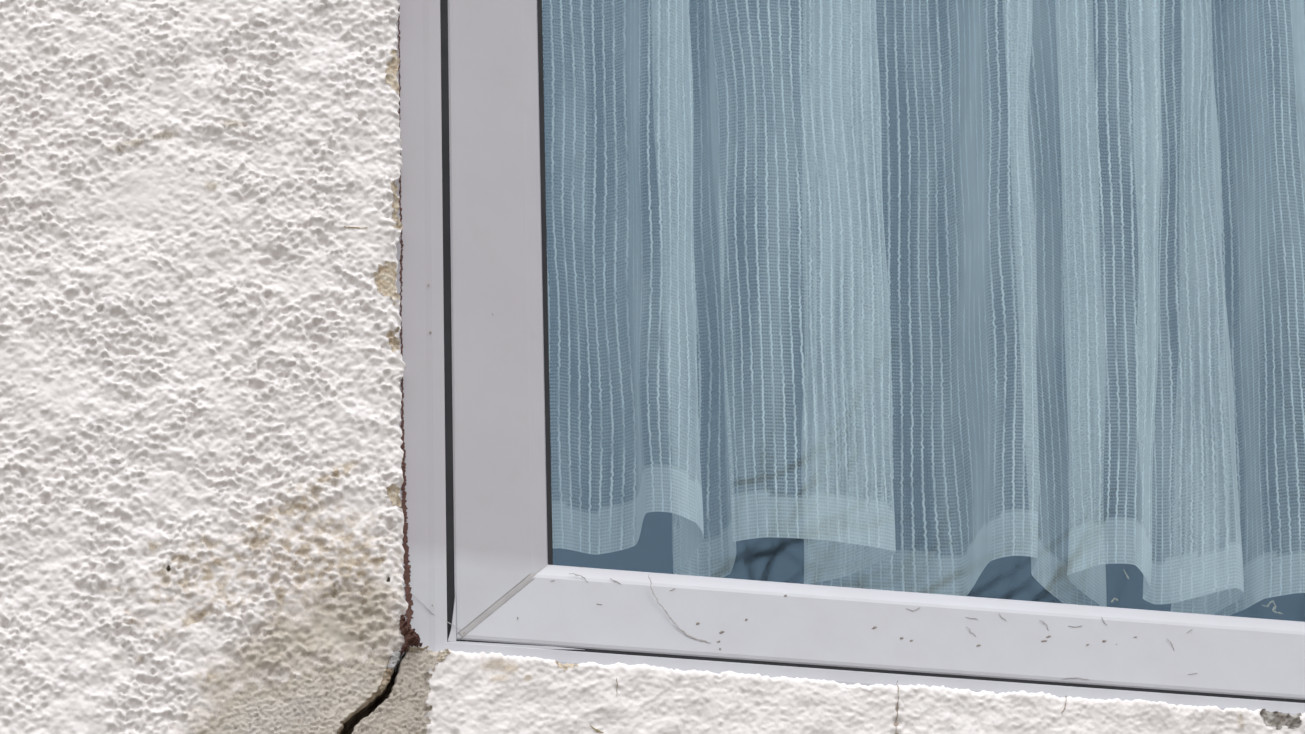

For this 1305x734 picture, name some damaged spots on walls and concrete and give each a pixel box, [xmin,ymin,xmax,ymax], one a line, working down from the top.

flaking render [386,484,401,508]
peeling [198,649,451,734]
crack [337,643,409,734]
flaking render [1260,709,1302,729]